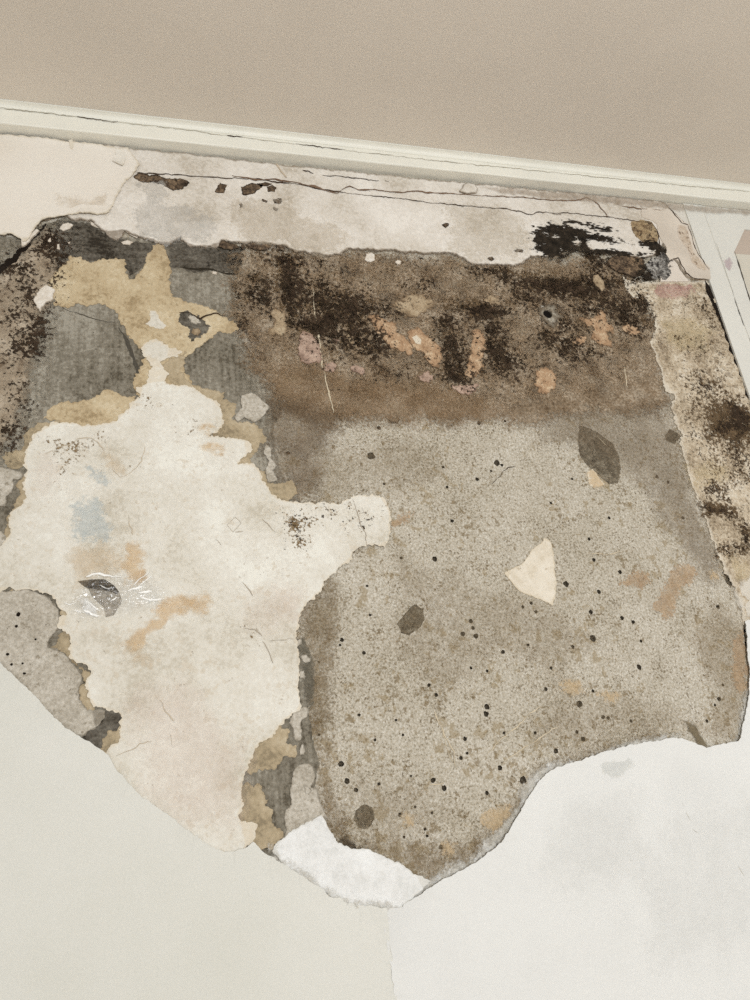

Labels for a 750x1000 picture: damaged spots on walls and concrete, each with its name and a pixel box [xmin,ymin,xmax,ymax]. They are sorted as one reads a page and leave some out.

leakage [0,224,79,462]
peeling [0,144,711,852]
crack [0,107,749,280]
leakage [222,218,750,565]